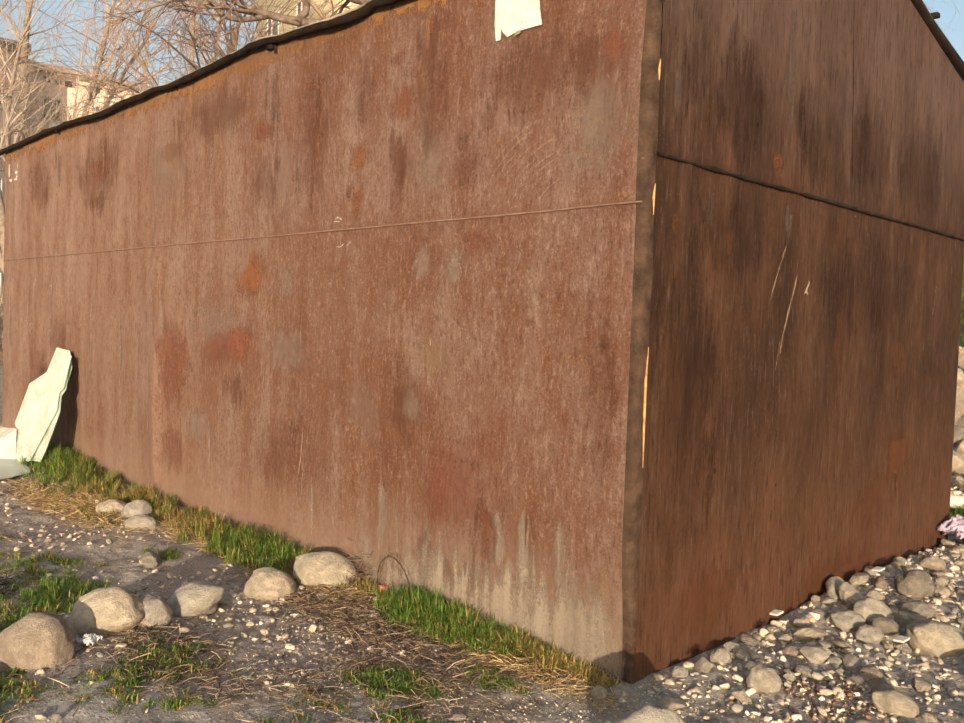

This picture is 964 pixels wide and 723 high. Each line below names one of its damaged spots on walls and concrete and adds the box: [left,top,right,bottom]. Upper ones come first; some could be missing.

rust [371,0,447,38]
rust [126,66,225,119]
rust [6,122,90,162]
rust [474,498,498,566]
water stain [355,487,620,682]